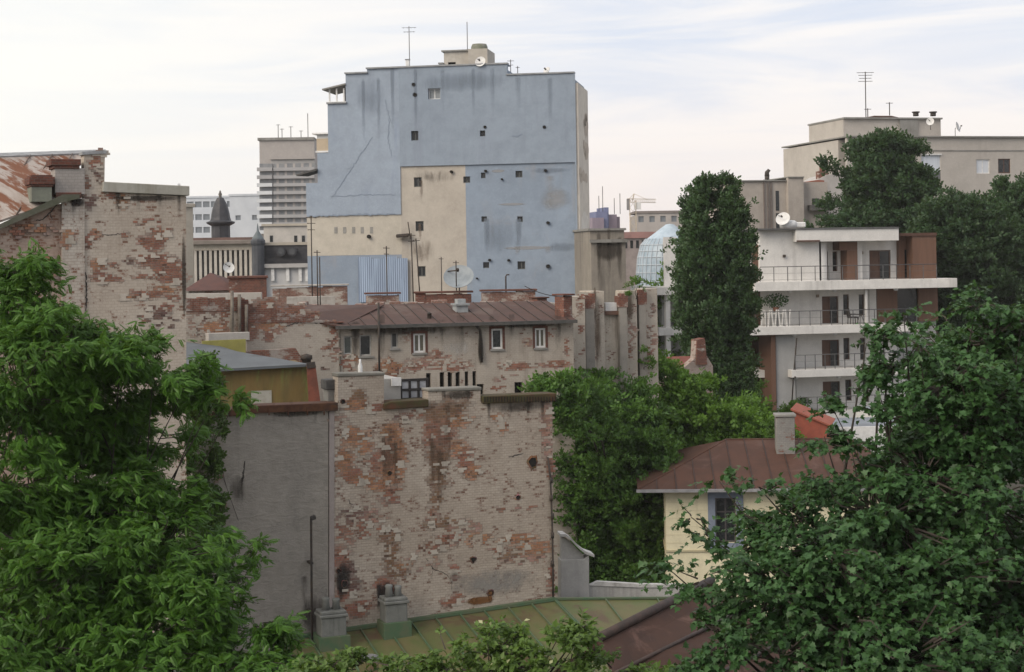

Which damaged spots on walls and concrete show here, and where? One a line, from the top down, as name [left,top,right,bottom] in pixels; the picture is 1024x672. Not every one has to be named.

crack [307,100,395,217]
flaking render [8,218,474,377]
flaking render [490,294,586,391]
flaking render [327,387,559,621]